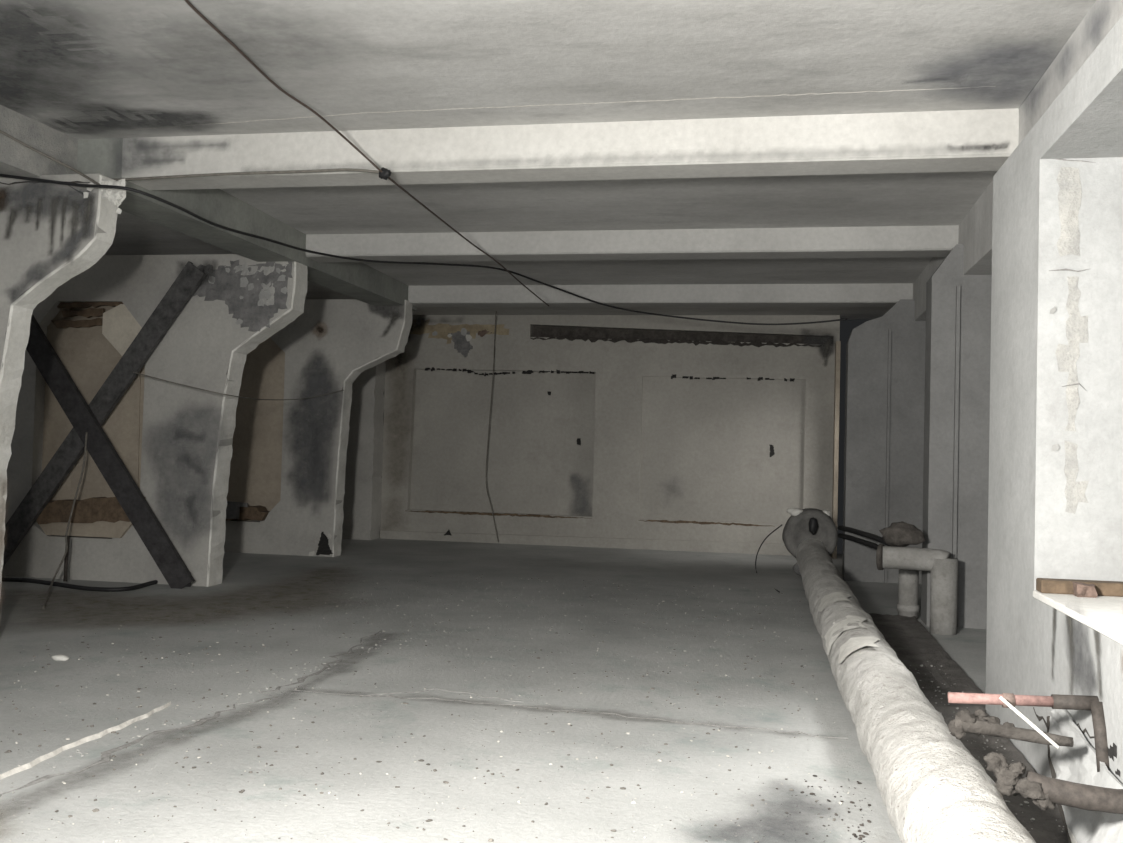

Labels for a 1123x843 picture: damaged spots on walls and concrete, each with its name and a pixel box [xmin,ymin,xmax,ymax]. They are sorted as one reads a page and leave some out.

water stain [4,181,94,301]
water stain [290,356,338,500]
crack [0,630,848,797]